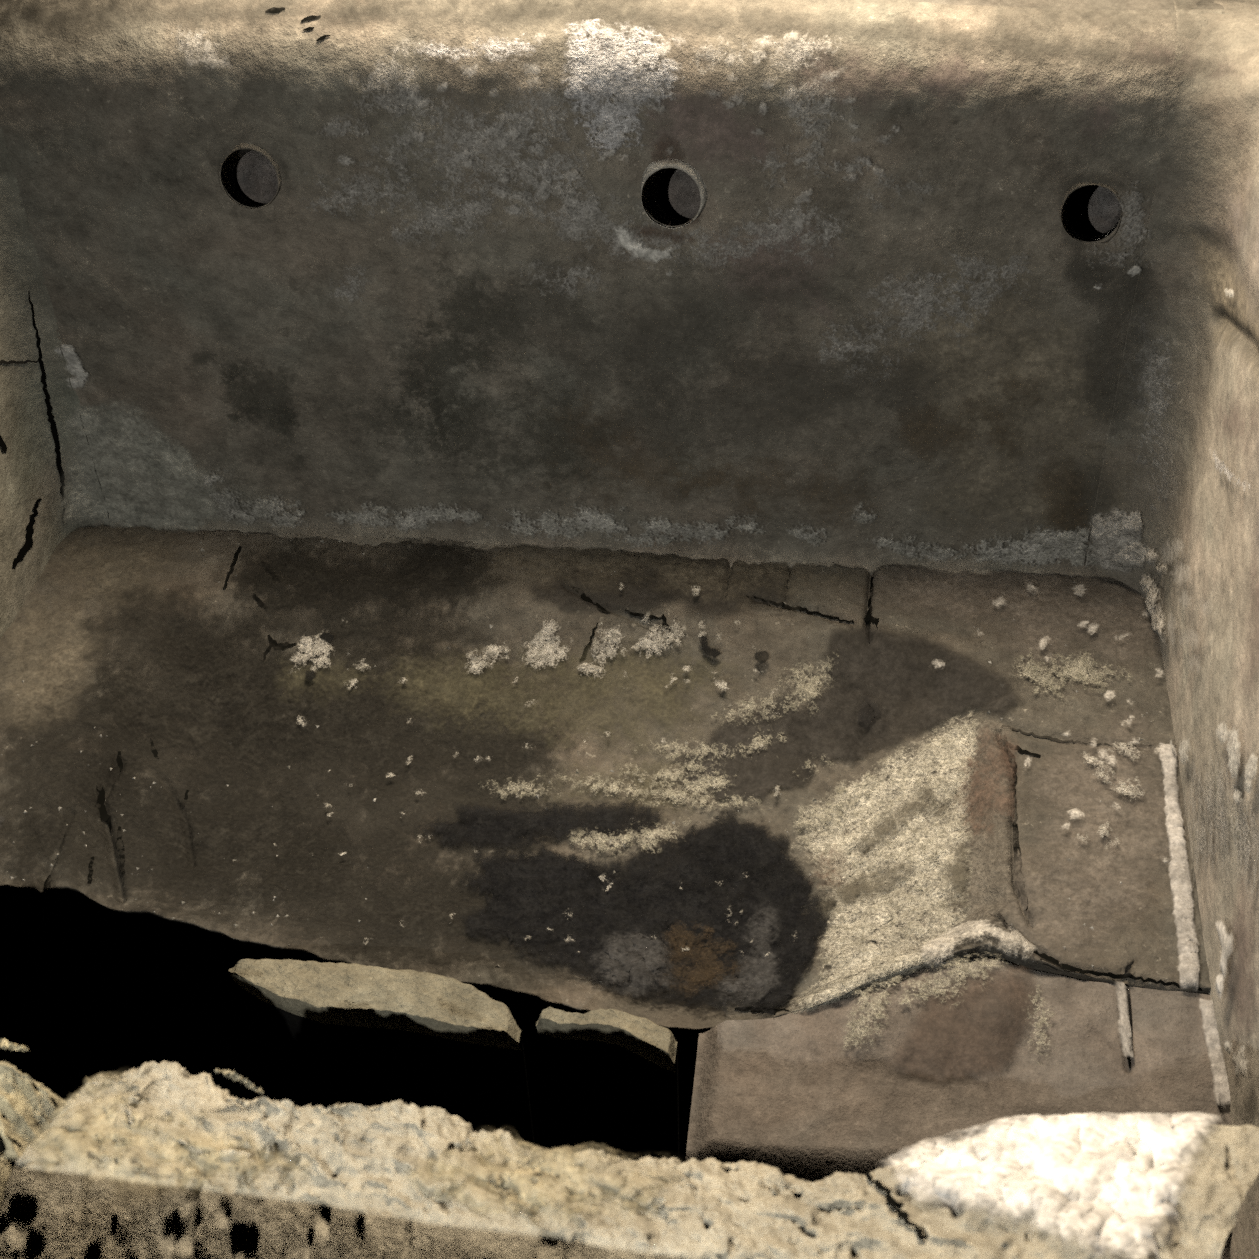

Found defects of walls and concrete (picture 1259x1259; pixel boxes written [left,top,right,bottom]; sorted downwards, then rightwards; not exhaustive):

damp [311,12,841,275]
crack [0,291,65,568]
crack [571,586,671,662]
crack [725,561,879,629]
damp [493,775,548,799]
damp [565,656,839,853]
damp [797,713,1036,1047]
crack [999,729,1041,917]
damp [1028,988,1054,1064]